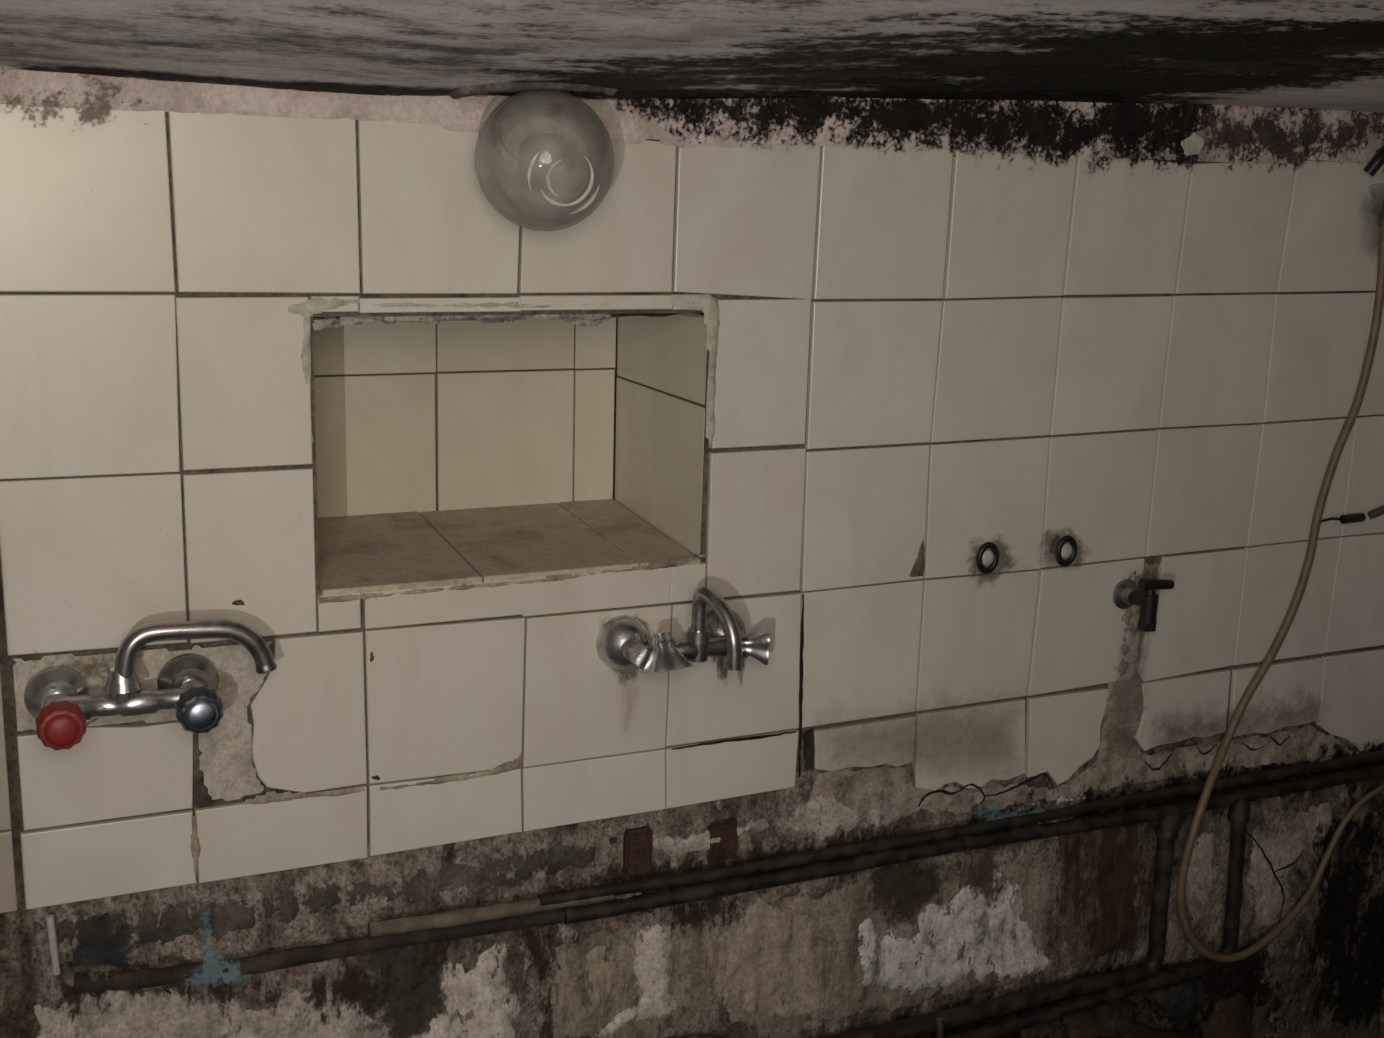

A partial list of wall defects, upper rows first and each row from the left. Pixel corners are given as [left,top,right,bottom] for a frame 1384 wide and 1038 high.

water stain [0,0,1384,173]
spalling [13,653,117,731]
spalling [86,710,178,727]
spalling [135,645,267,801]
spalling [737,608,1359,841]
flaking render [652,830,721,855]
water stain [971,742,1384,1038]
water stain [177,978,280,1035]
water stain [521,928,557,1038]